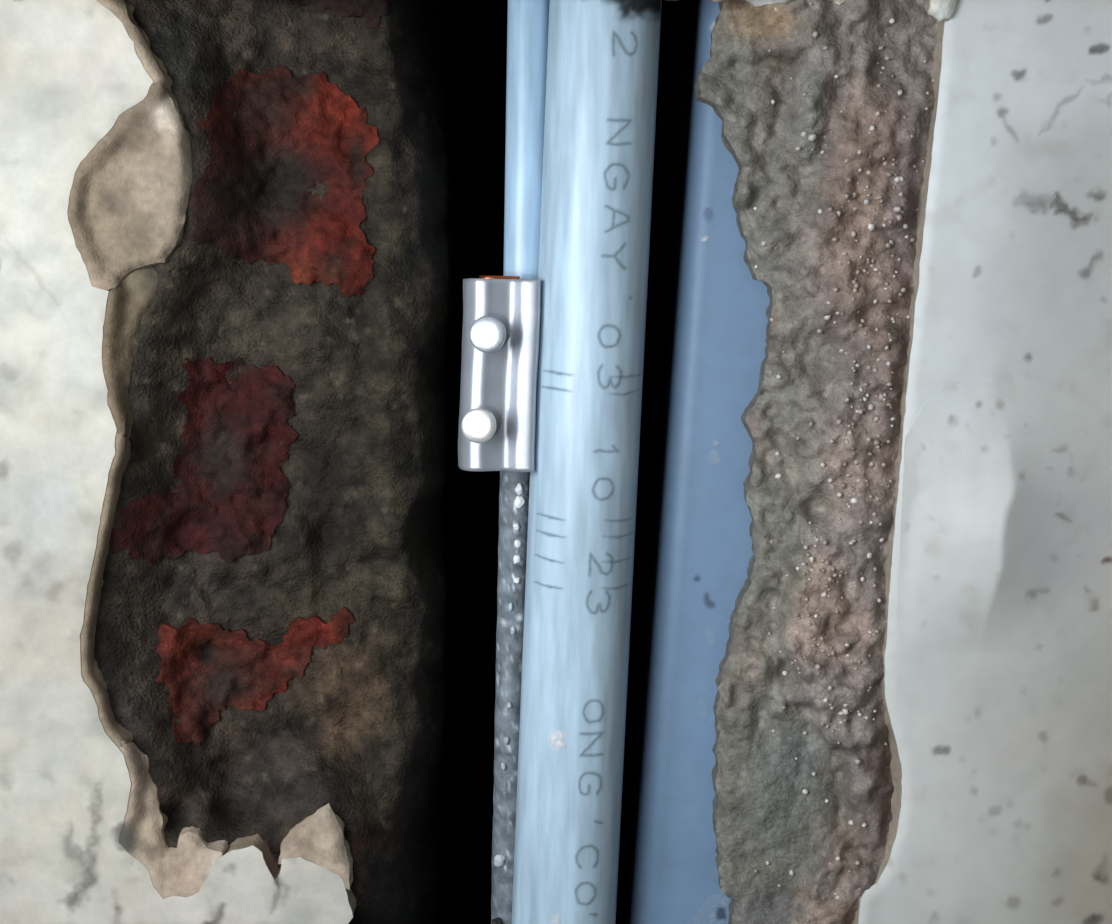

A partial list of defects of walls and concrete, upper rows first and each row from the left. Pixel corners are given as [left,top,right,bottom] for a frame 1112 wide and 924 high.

spalling [68,0,487,924]
spalling [694,0,957,924]